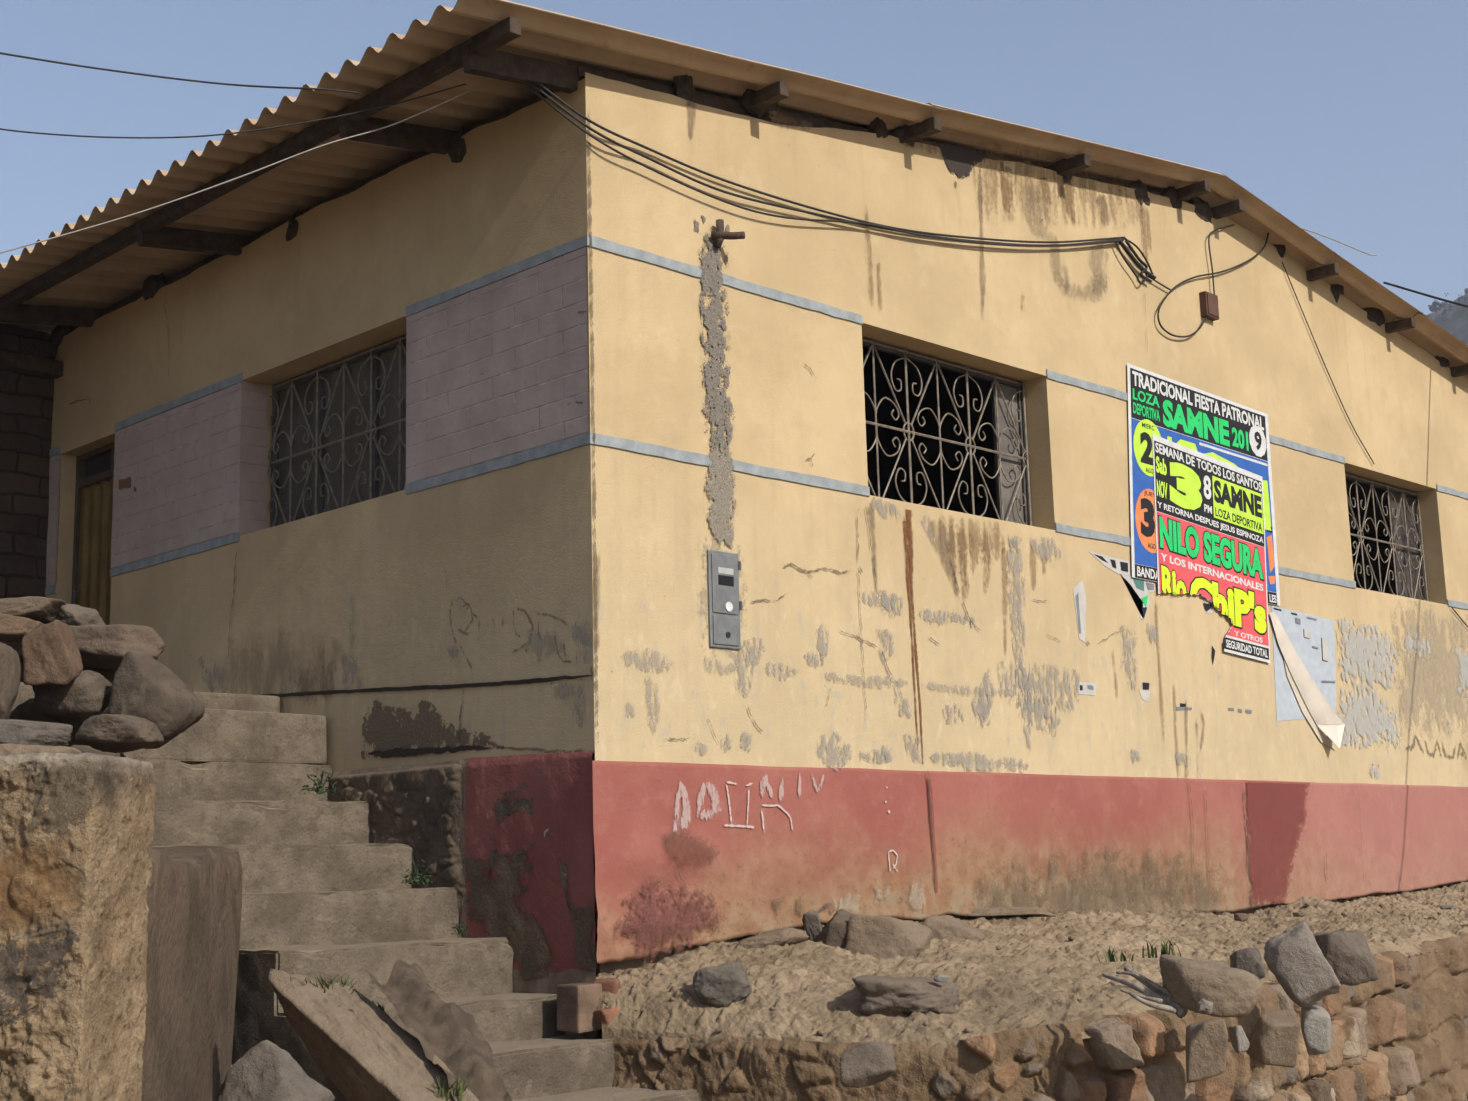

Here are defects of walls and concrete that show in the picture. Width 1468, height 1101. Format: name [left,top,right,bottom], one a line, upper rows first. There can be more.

peeling [695,731,752,755]
peeling [735,625,829,696]
peeling [817,535,1080,771]
peeling [1121,623,1158,688]
peeling [1337,617,1431,780]
spalling [327,699,556,980]
peeling [559,856,596,971]